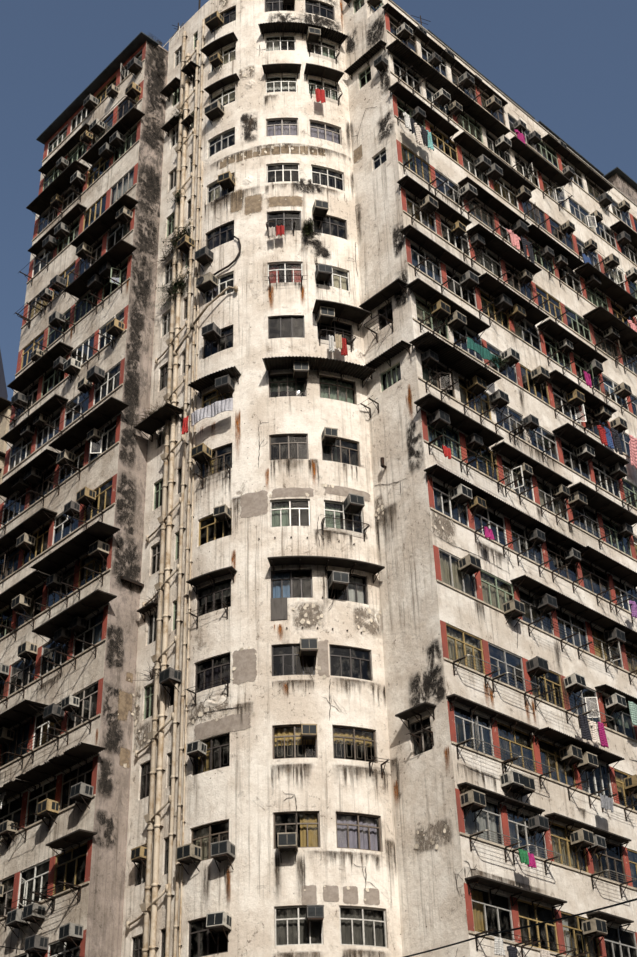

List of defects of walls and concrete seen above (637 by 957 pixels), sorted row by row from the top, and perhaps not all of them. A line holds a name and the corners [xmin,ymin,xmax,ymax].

water stain [214,114,292,165]
water stain [303,221,331,261]
water stain [114,166,160,592]
water stain [407,423,423,471]
spalling [240,484,384,526]
peeling [292,603,323,628]
peeling [354,608,381,635]
water stain [106,626,124,667]
spalling [232,646,257,684]
spalling [317,640,330,679]
water stain [410,640,445,707]
spalling [188,693,255,741]